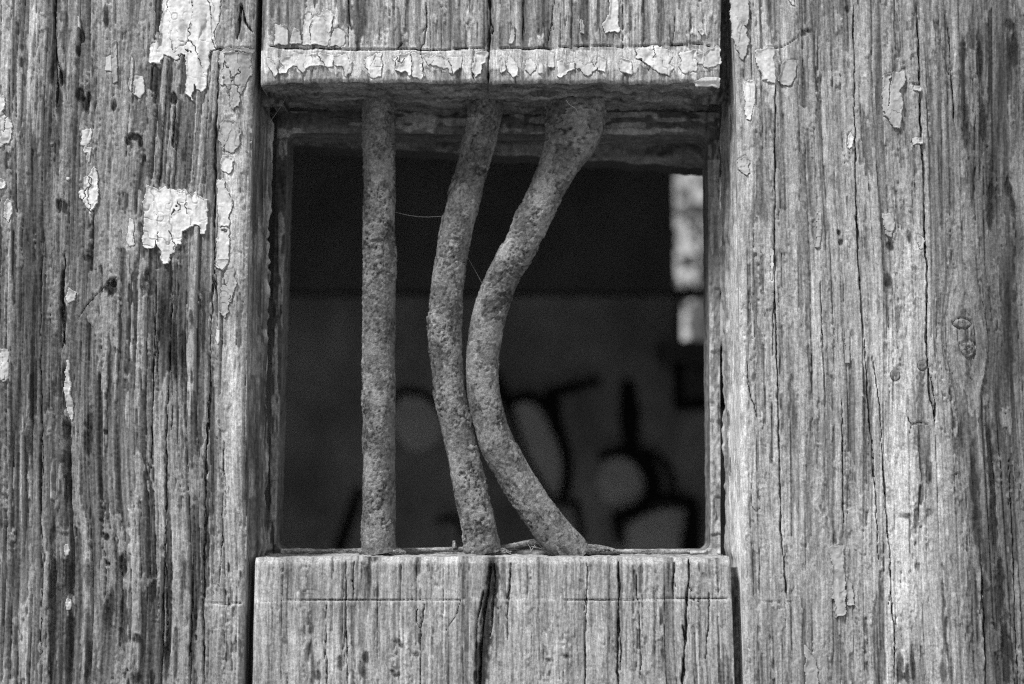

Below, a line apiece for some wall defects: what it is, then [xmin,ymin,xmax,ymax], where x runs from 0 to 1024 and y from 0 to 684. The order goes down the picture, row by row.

peeling [79,128,99,215]
peeling [126,0,255,318]
crack [151,0,611,684]
peeling [267,9,606,82]
peeling [619,45,722,89]
peeling [729,0,797,121]
crack [747,291,787,604]
crack [852,9,896,669]
peeling [881,71,922,129]
crack [907,22,936,428]